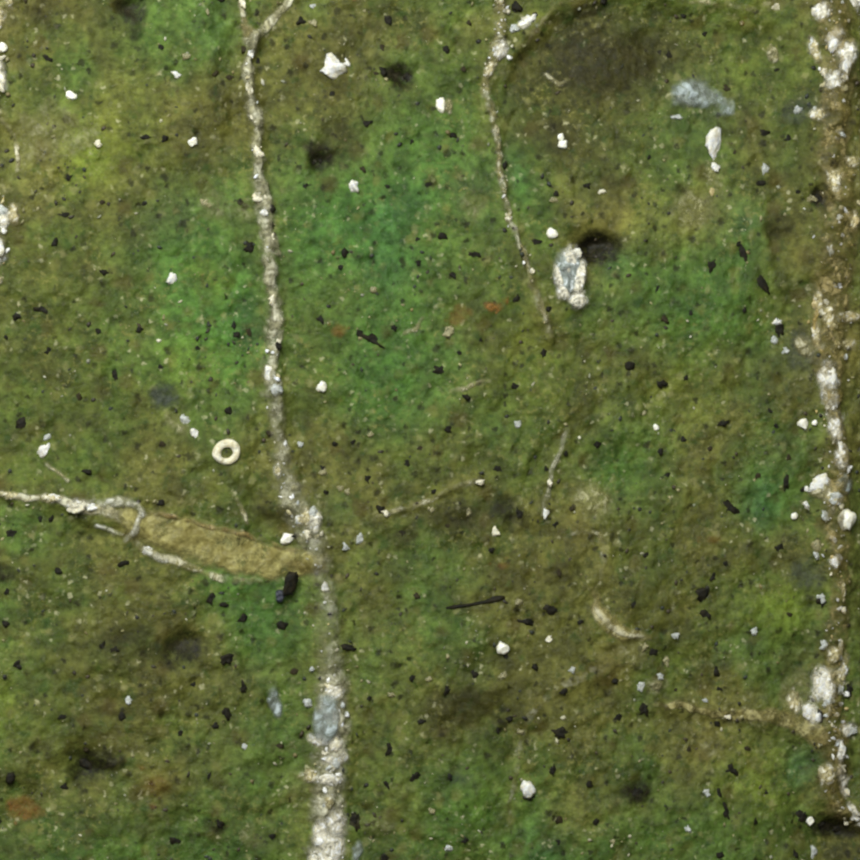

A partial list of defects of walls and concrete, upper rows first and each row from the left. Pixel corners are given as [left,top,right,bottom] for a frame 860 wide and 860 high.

leakage [576,231,621,265]
peeling [121,508,324,603]